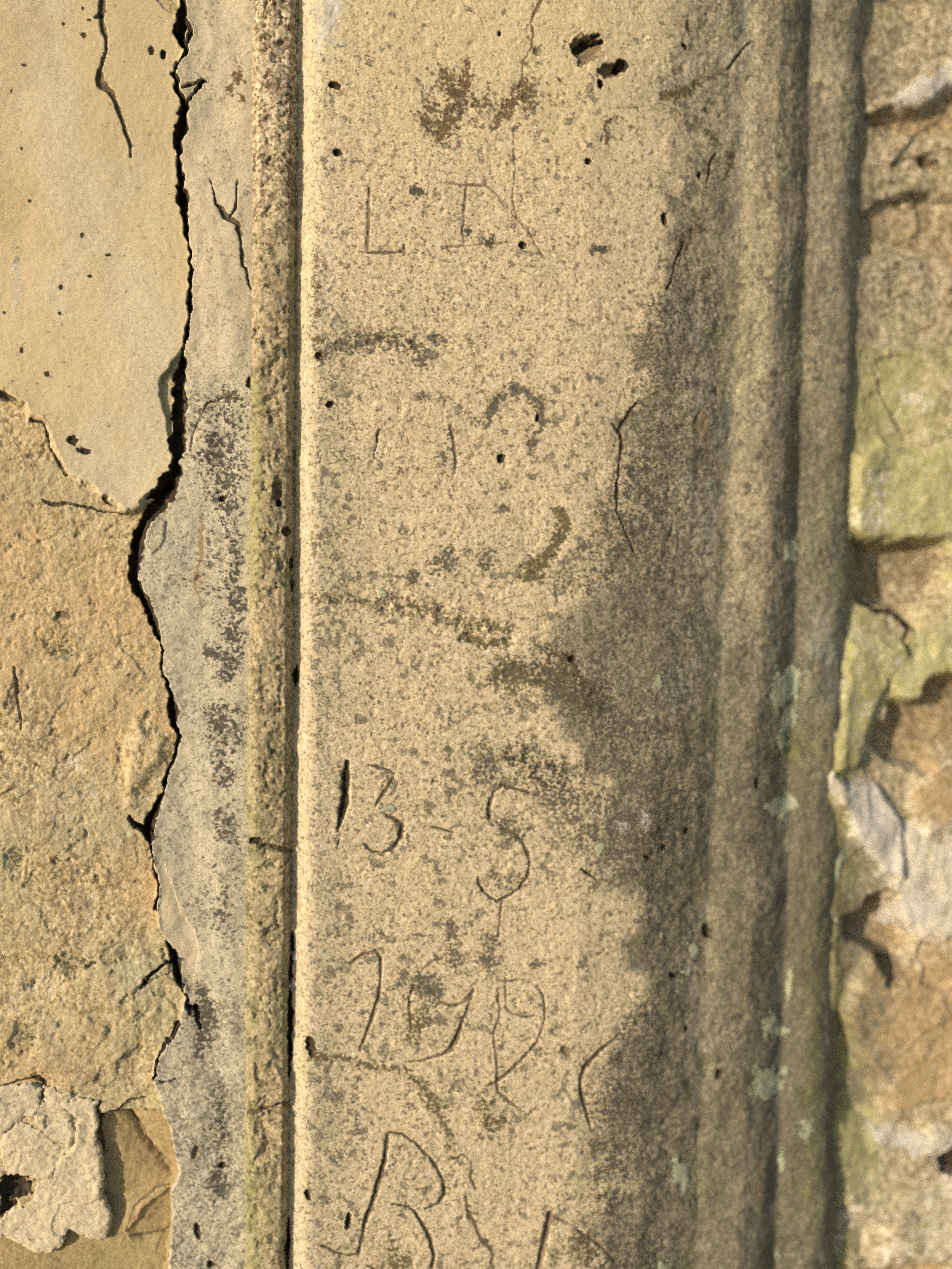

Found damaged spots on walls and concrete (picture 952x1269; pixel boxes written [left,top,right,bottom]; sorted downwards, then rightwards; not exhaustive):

leakage [703,128,735,181]
crack [0,0,252,911]
spalling [159,351,182,435]
crack [612,403,637,552]
crack [857,602,910,654]
leakage [303,212,721,1269]
flaking render [0,398,184,1269]
crack [0,1075,47,1102]
crack [92,941,202,1236]